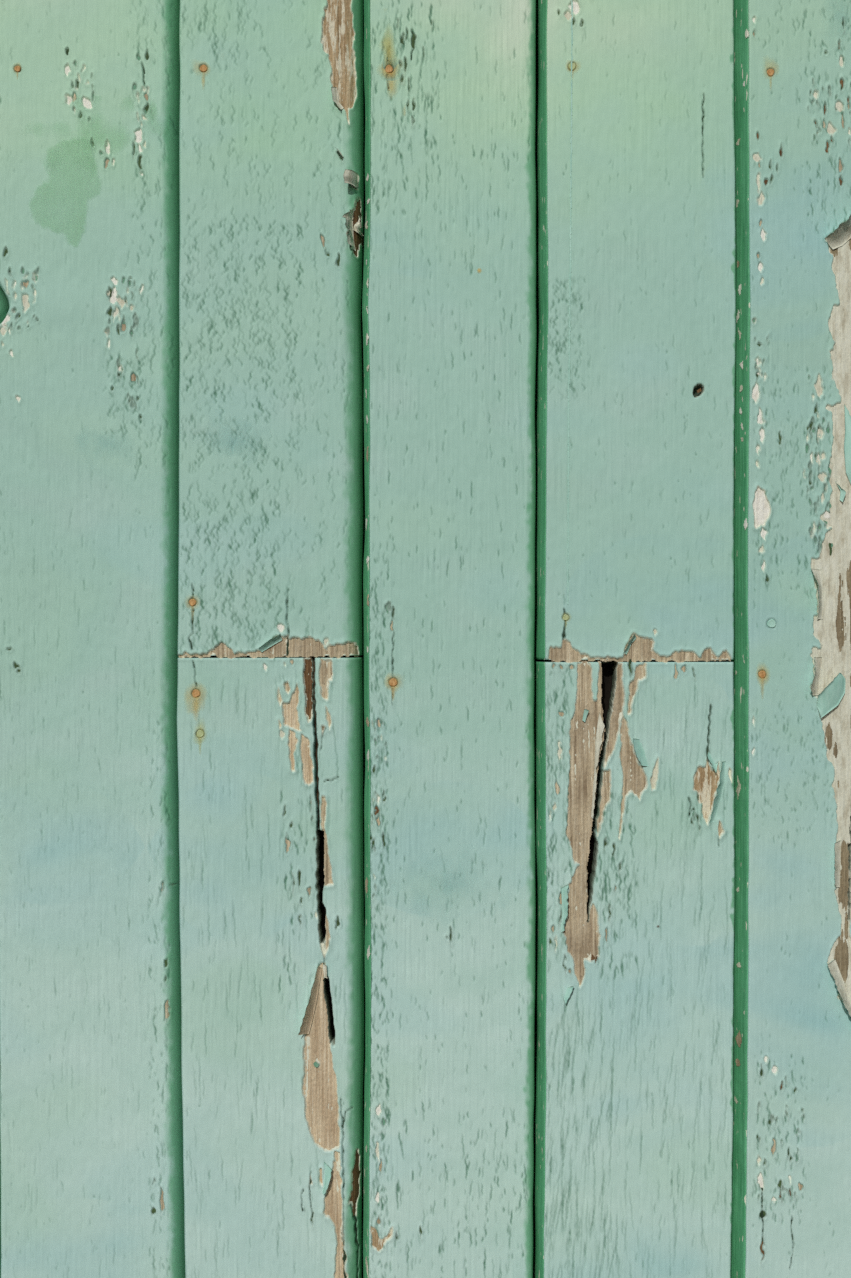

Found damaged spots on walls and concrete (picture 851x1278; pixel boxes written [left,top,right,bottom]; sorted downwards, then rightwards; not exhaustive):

peeling [322,0,356,122]
peeling [549,611,741,1004]
peeling [803,215,851,1016]
peeling [298,963,397,1278]